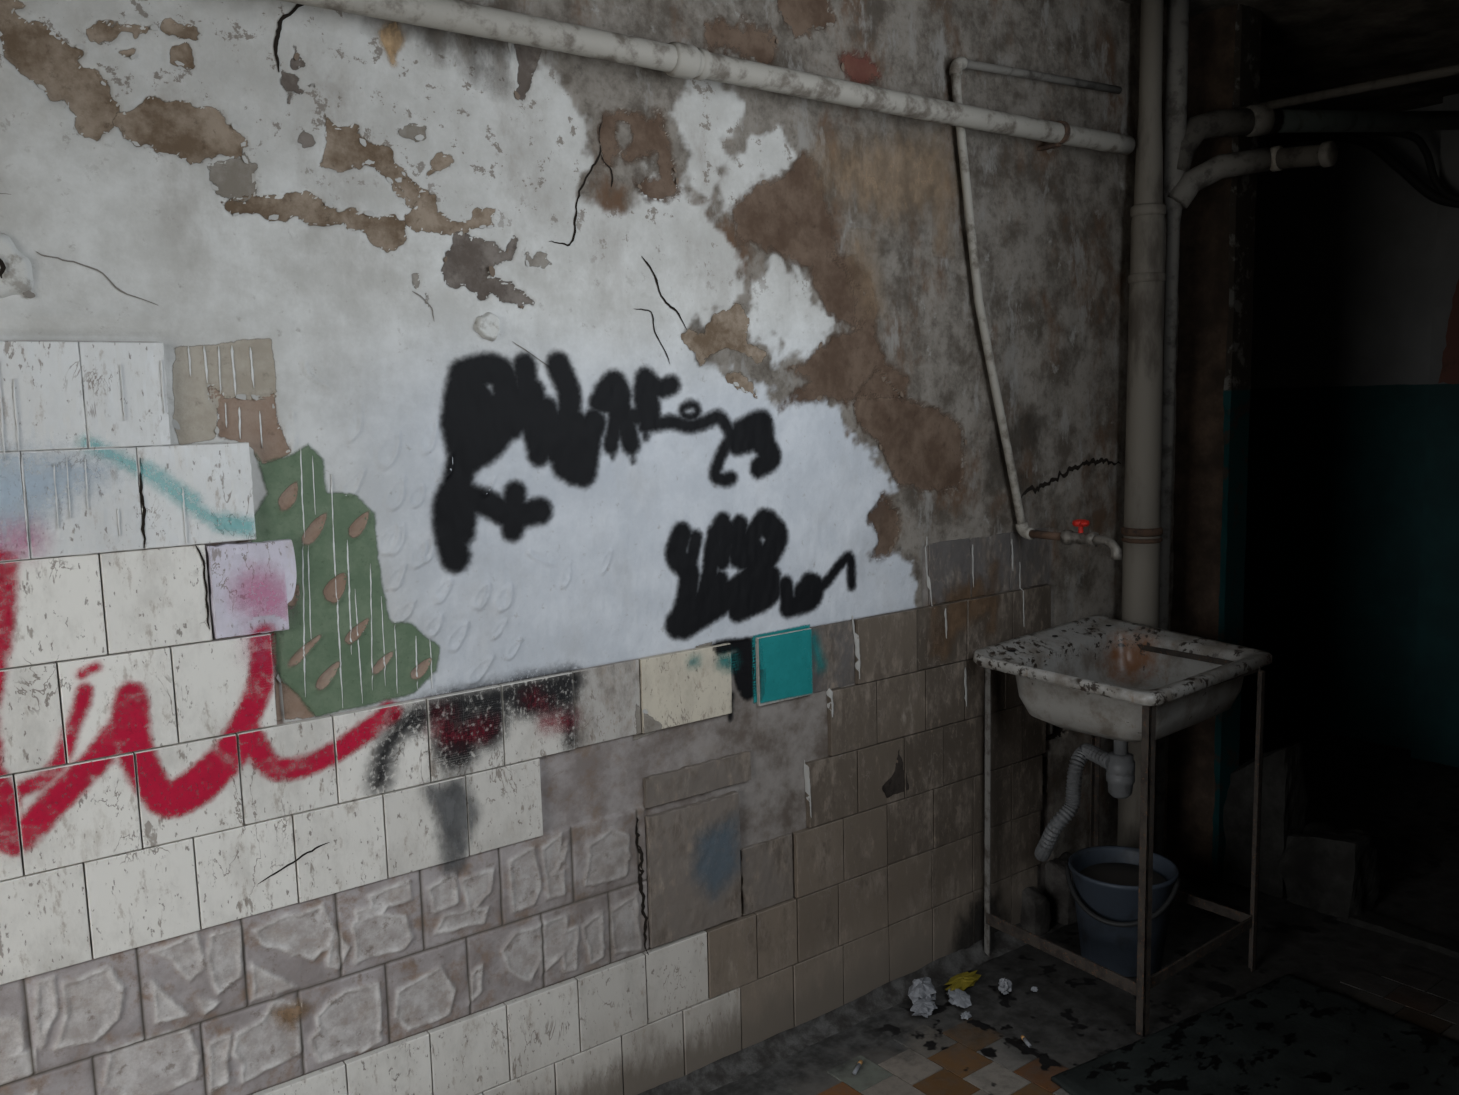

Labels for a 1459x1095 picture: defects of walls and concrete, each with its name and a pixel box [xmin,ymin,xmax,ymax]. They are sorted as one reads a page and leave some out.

flaking render [0,0,552,309]
flaking render [597,108,680,203]
flaking render [681,303,767,399]
flaking render [732,151,967,559]
crack [1021,458,1121,498]